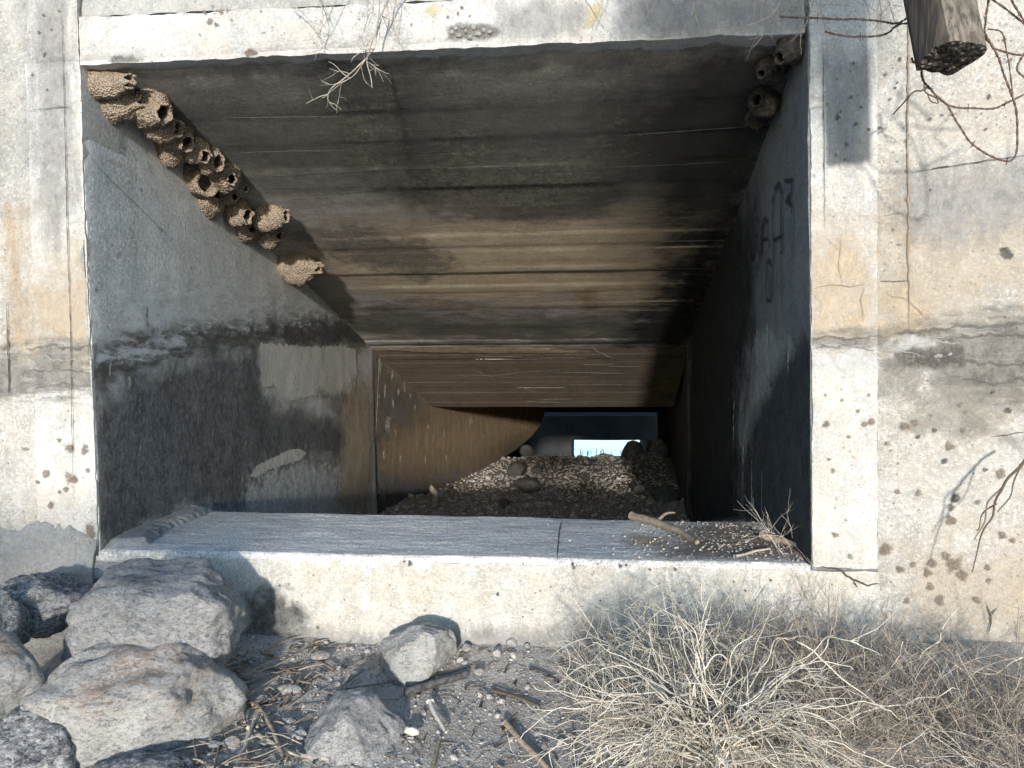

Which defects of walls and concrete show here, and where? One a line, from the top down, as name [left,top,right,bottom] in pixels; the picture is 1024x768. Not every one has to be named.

leakage [288,190,721,314]
crack [814,29,1023,328]
leakage [0,282,467,549]
leakage [733,317,1024,565]